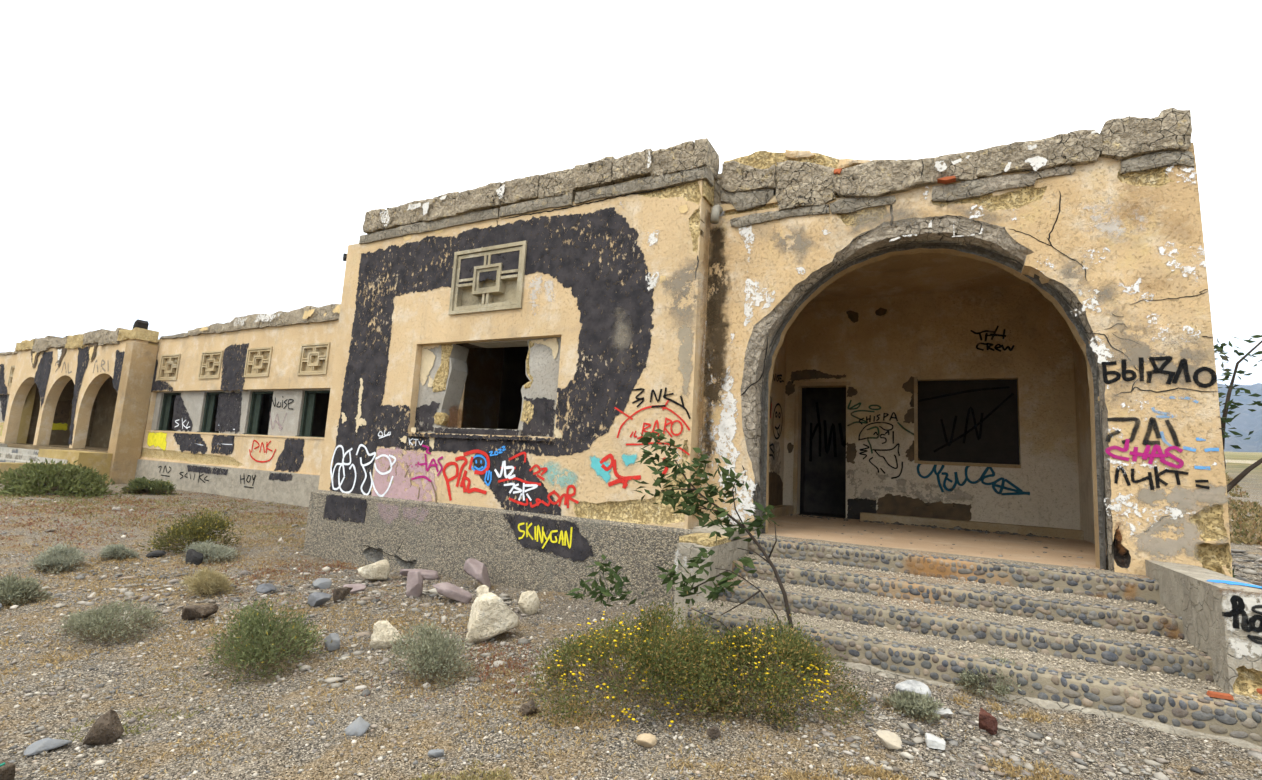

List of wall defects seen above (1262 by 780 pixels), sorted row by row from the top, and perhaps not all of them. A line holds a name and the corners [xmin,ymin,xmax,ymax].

peeling [785,150,816,159]
peeling [837,159,871,169]
peeling [935,155,970,172]
peeling [1004,144,1047,172]
crack [972,190,1086,279]
crack [1086,289,1218,396]
spalling [574,181,1262,700]